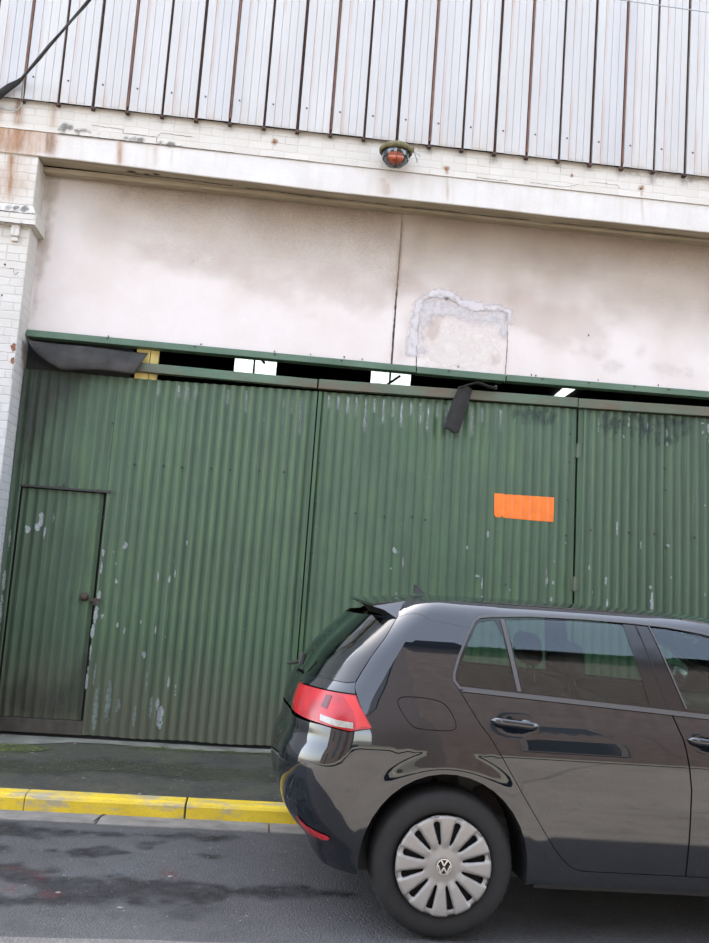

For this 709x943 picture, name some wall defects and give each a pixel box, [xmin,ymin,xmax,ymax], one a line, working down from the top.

peeling [407,288,512,364]
peeling [25,512,55,539]
peeling [85,591,121,731]
peeling [145,672,164,729]